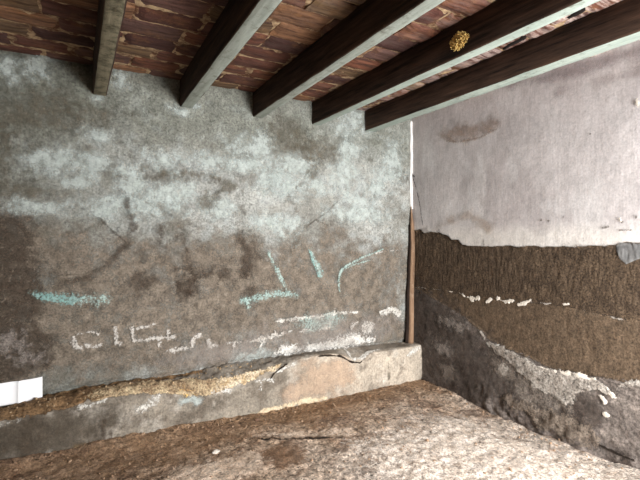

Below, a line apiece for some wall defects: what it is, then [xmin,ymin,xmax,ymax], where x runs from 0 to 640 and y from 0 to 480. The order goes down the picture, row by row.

leakage [0,58,17,81]
leakage [24,56,48,76]
leakage [0,111,514,414]
flaking render [414,229,640,452]
crack [318,354,362,364]
leakage [565,393,603,429]